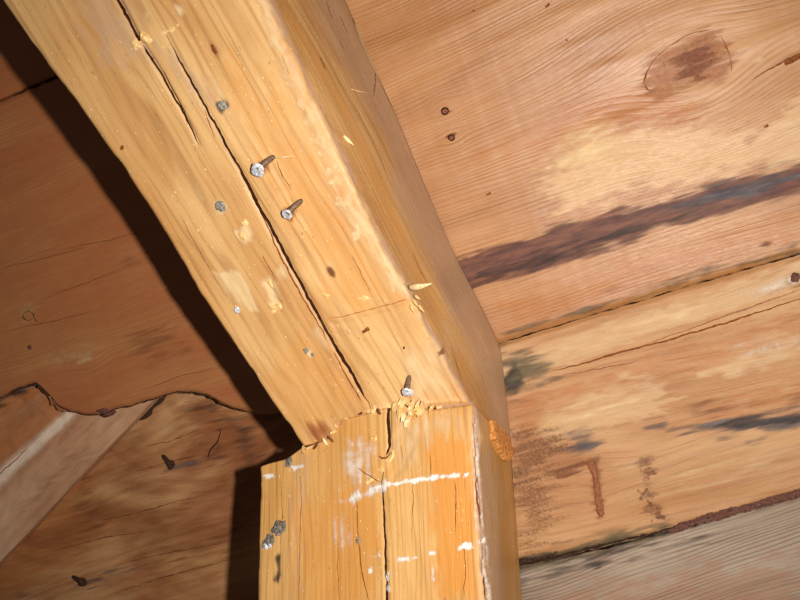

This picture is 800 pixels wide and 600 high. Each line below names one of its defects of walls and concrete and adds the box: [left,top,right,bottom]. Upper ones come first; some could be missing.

leakage [459,164,800,288]
crack [116,0,431,600]
crack [548,290,800,375]
leakage [503,352,549,393]
leakage [698,415,800,430]
leakage [569,442,598,451]
leakage [557,462,586,478]